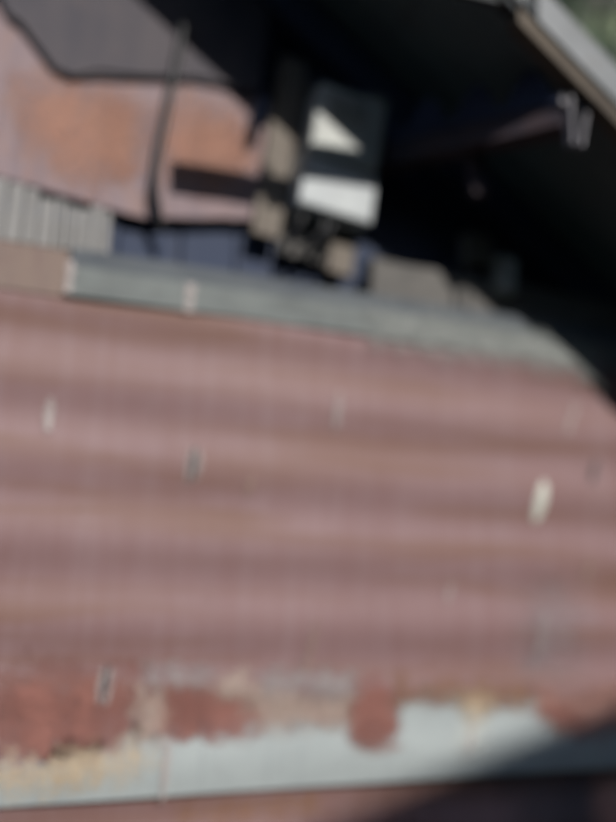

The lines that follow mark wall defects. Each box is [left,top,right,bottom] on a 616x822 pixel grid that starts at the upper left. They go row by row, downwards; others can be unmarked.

peeling [0,684,616,807]